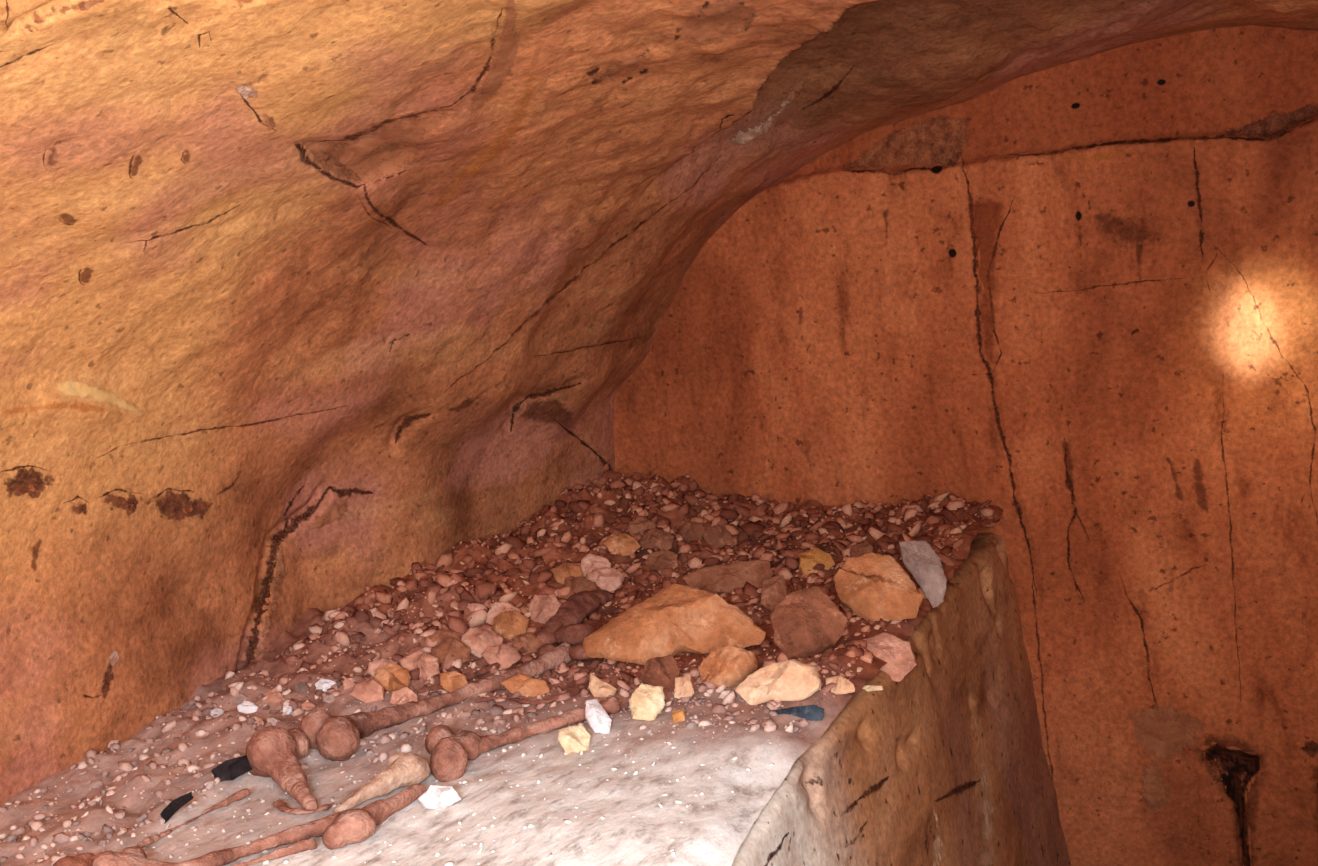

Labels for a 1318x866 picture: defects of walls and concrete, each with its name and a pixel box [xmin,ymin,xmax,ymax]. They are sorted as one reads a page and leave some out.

spalling [26,0,104,32]
spalling [719,81,805,144]
crack [1042,147,1318,524]
crack [244,486,373,663]
crack [960,154,1054,782]
crack [1063,438,1089,602]
crack [1121,374,1241,708]